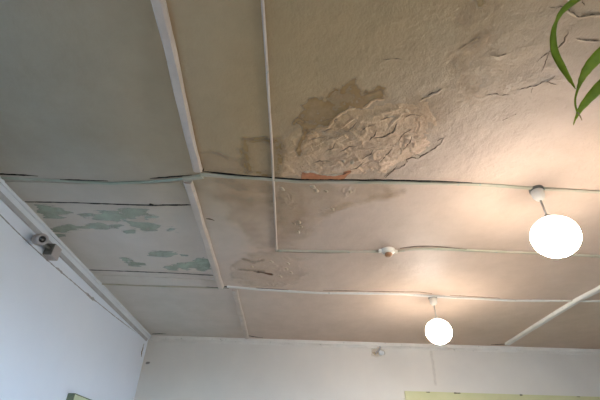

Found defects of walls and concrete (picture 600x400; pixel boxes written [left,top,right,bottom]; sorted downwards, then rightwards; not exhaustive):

crack [549,0,600,19]
crack [485,31,598,97]
crack [419,89,442,102]
peeling [36,205,160,237]
peeling [148,251,211,271]